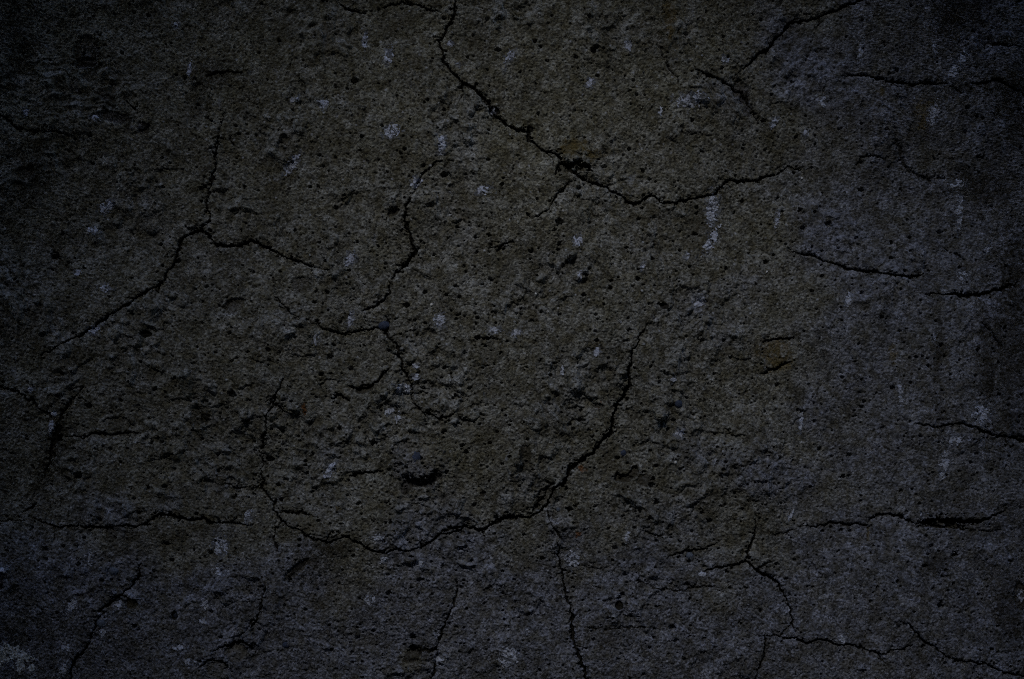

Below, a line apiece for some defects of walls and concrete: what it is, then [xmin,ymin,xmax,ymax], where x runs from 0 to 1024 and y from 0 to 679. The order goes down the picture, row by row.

crack [338,0,801,216]
crack [658,0,870,121]
crack [42,118,330,355]
crack [275,159,477,422]
crack [787,247,1017,299]
crack [0,385,141,478]
crack [0,503,249,541]
crack [211,323,665,679]
crack [638,510,1024,679]